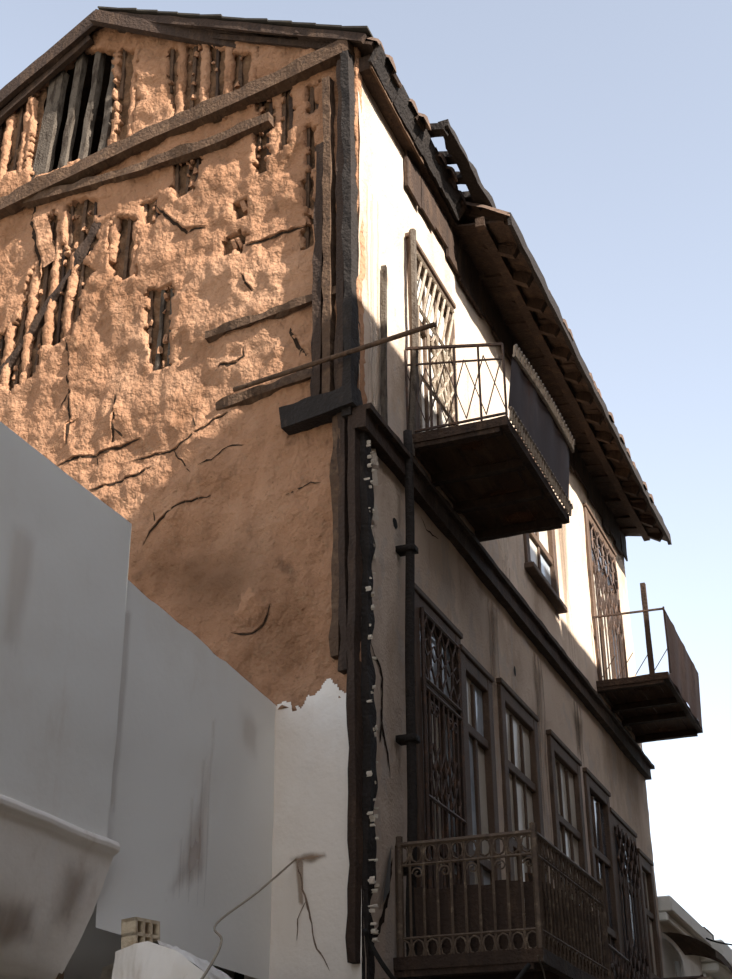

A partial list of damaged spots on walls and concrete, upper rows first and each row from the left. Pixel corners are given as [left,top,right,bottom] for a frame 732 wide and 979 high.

spalling [0,86,47,180]
spalling [164,42,259,115]
spalling [247,89,295,174]
spalling [308,87,319,114]
crack [157,198,211,234]
spalling [304,127,316,250]
spalling [0,199,160,390]
spalling [147,286,175,371]
crack [56,336,245,545]
crack [231,605,270,635]
peeling [360,432,392,979]